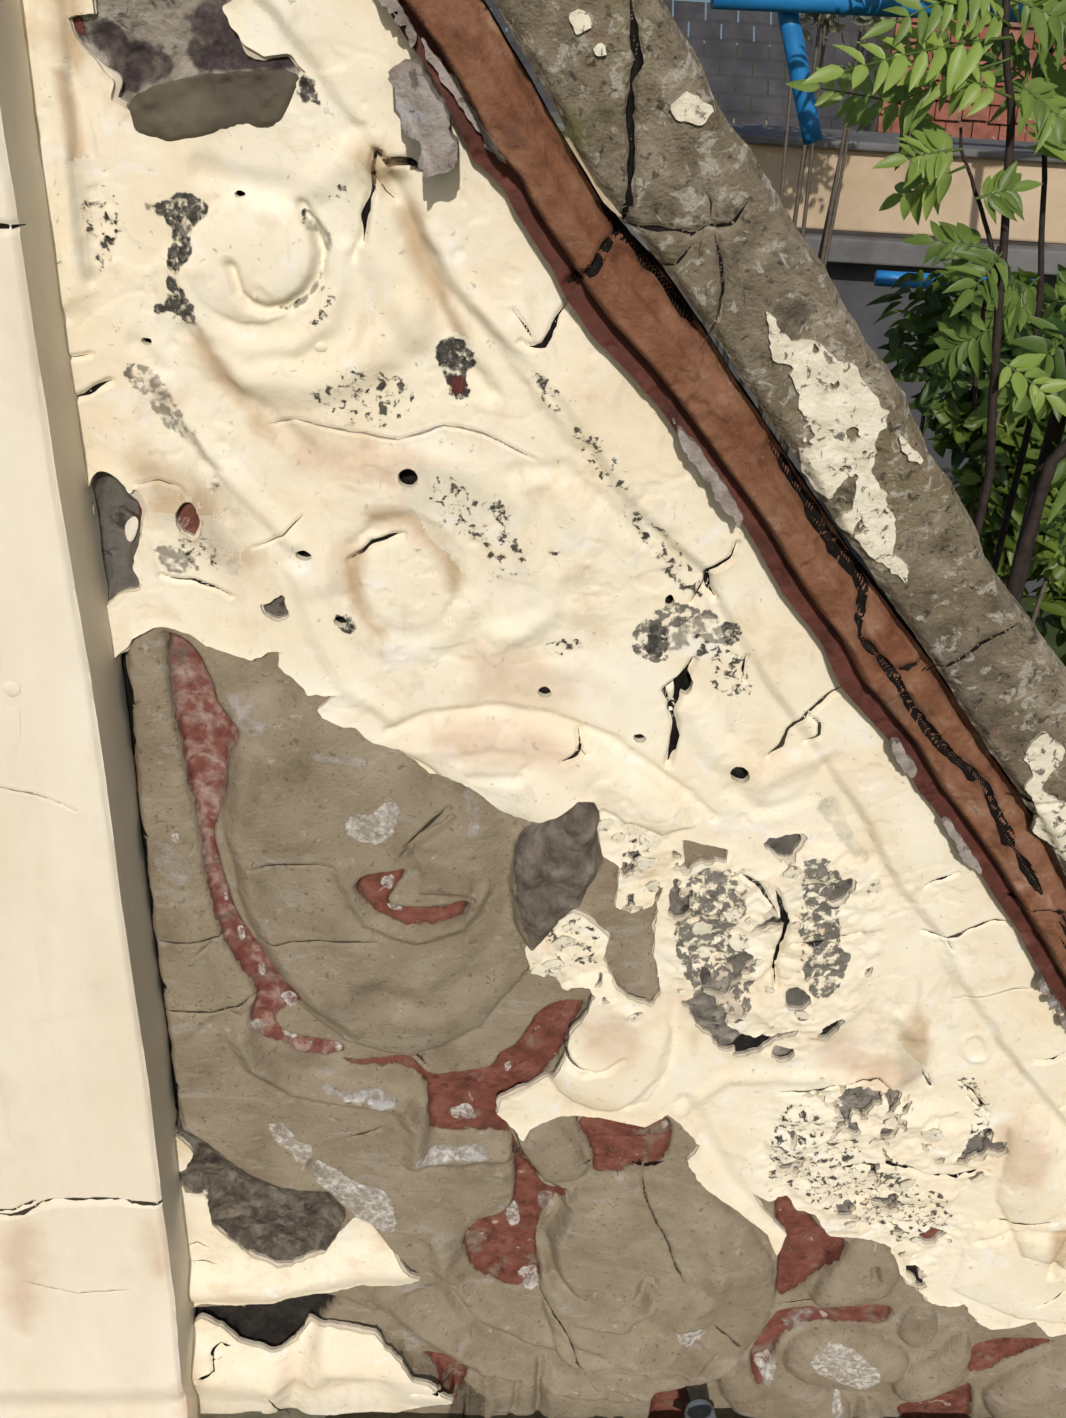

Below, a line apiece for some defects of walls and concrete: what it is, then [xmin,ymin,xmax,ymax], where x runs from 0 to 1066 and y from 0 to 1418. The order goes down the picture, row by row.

spalling [73,0,300,142]
crack [0,222,26,230]
crack [361,150,423,237]
crack [512,0,748,348]
spalling [92,471,142,601]
crack [351,532,403,558]
crack [690,542,737,602]
crack [662,657,693,760]
crack [769,442,1066,949]
crack [742,874,846,981]
spalling [121,627,1066,1418]
crack [0,1197,163,1216]